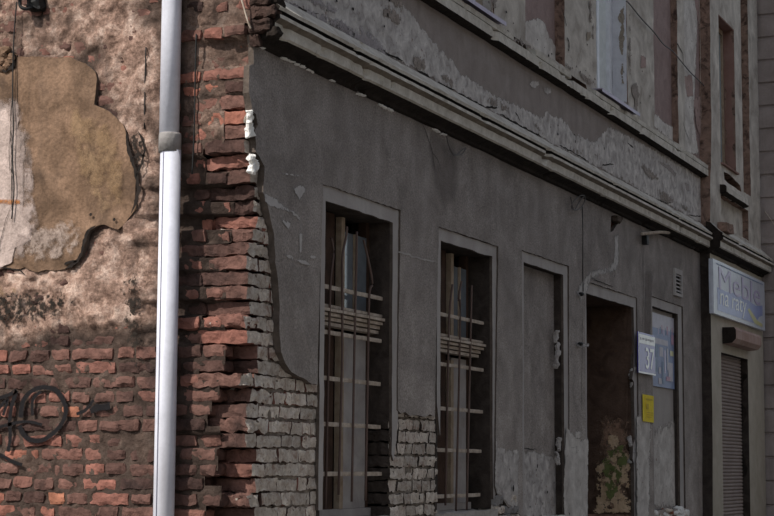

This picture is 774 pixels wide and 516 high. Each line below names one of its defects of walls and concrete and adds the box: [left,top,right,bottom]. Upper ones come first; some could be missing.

peeling [285,0,701,223]
flaking render [184,95,318,516]
flaking render [368,413,438,516]
peeling [478,415,675,516]